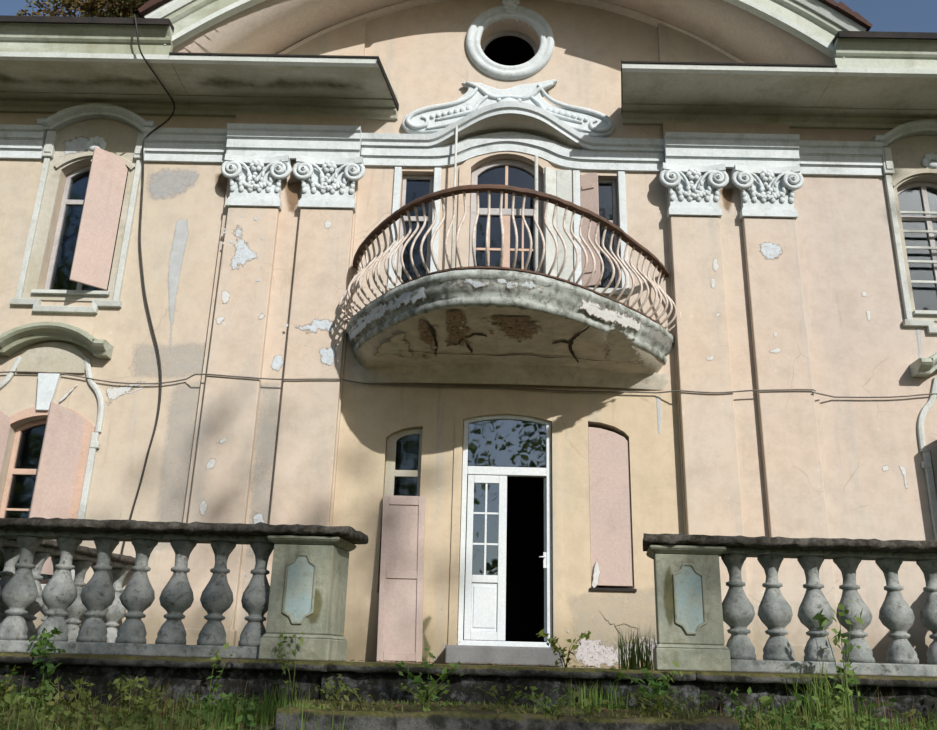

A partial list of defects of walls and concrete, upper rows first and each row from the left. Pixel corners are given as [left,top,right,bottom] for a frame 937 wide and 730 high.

peeling [222,215,262,270]
peeling [759,242,786,260]
peeling [285,318,334,333]
peeling [319,345,336,366]
peeling [348,286,427,342]
spalling [418,310,471,359]
crack [398,320,609,362]
spalling [483,316,543,343]
peeling [578,298,641,332]
peeling [574,636,658,668]